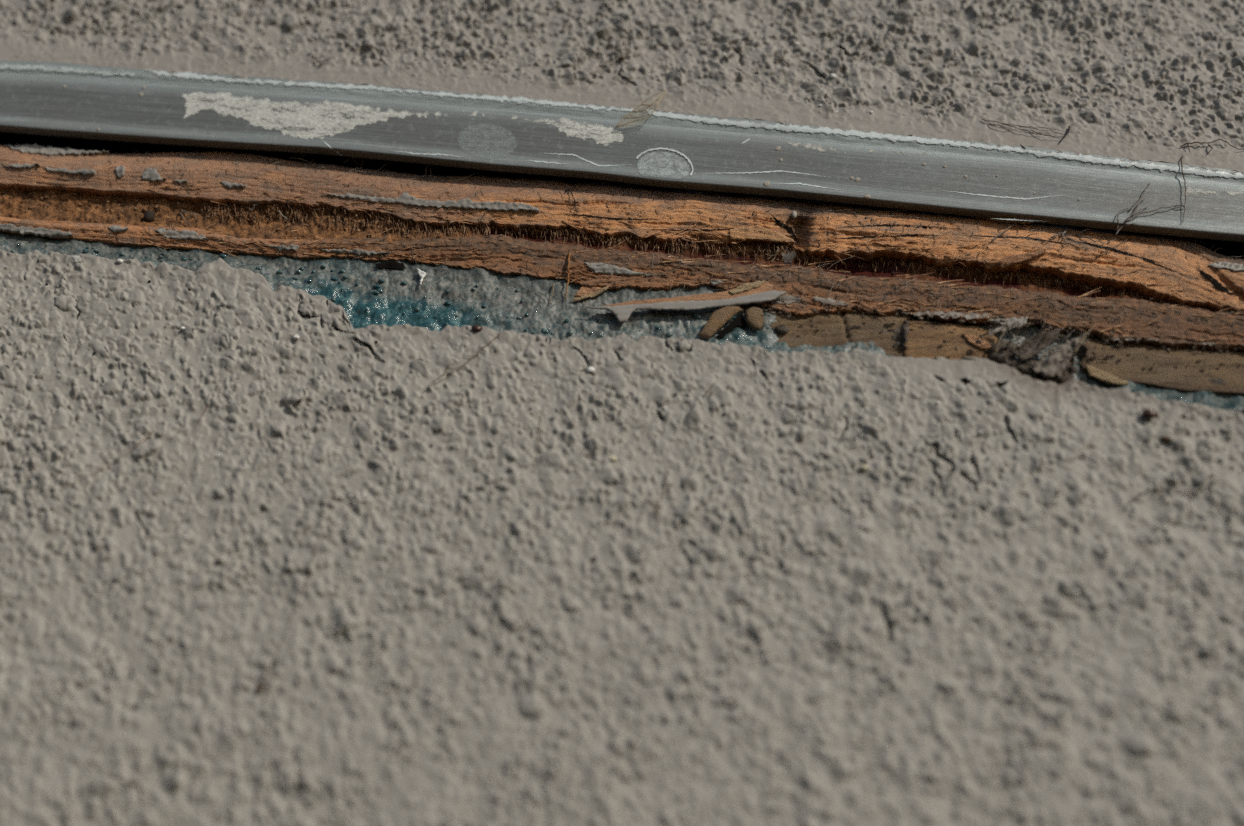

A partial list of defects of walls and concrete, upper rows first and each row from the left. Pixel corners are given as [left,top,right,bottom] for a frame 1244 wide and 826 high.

peeling [3,144,110,176]
peeling [323,192,540,214]
peeling [0,223,73,238]
peeling [155,228,209,241]
peeling [585,262,653,276]
spalling [837,257,909,276]
peeling [1207,261,1244,272]
peeling [768,295,849,306]
peeling [908,311,1028,328]